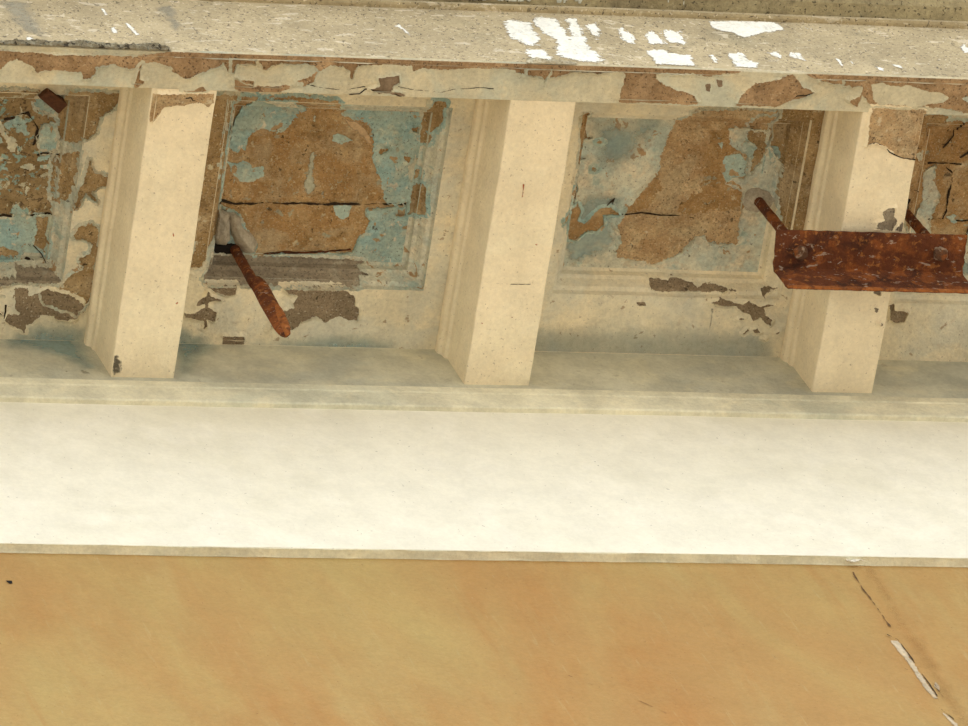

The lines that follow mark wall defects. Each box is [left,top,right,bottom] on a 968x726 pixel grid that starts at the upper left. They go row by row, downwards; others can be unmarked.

crack [264,247,351,255]
crack [219,198,406,206]
peeling [0,16,968,345]
rust [787,285,968,293]
crack [914,122,968,260]
crack [853,572,958,726]